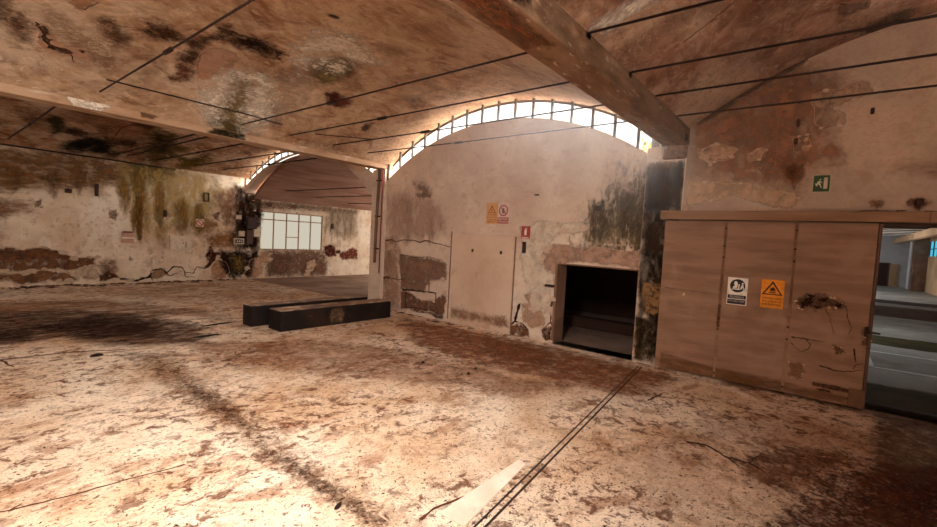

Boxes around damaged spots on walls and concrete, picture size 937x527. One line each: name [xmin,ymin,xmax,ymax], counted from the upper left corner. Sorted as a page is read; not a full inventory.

crack [35,22,74,62]
water stain [144,23,384,83]
water stain [0,96,328,279]
water stain [193,67,280,140]
peeling [697,142,768,174]
water stain [696,67,841,185]
flaking render [0,246,135,286]
crack [120,266,205,282]
flaking render [398,254,447,319]
water stain [588,161,684,360]
peeling [794,293,844,312]
crack [791,306,863,372]